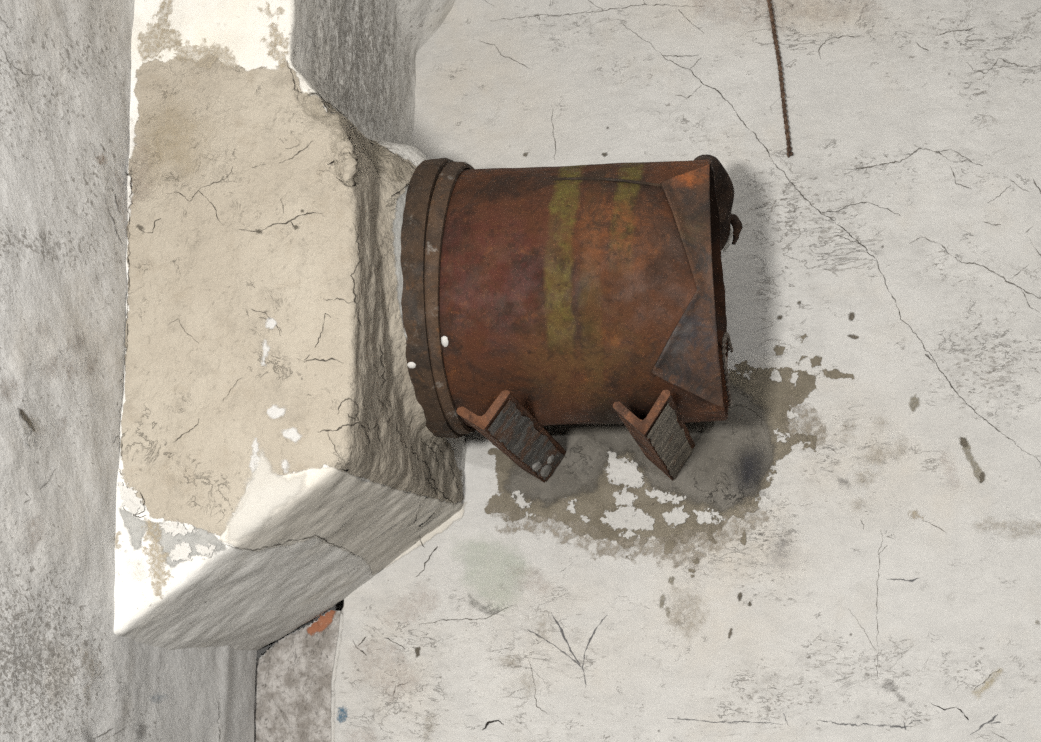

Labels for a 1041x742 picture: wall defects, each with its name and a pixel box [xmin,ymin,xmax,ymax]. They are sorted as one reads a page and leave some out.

crack [91,172,161,475]
crack [166,141,316,232]
peeling [114,0,464,599]
crack [252,223,361,363]
crack [287,65,415,196]
crack [481,0,1041,464]
crack [320,345,461,503]
flaking render [484,344,854,583]
crack [232,535,361,558]